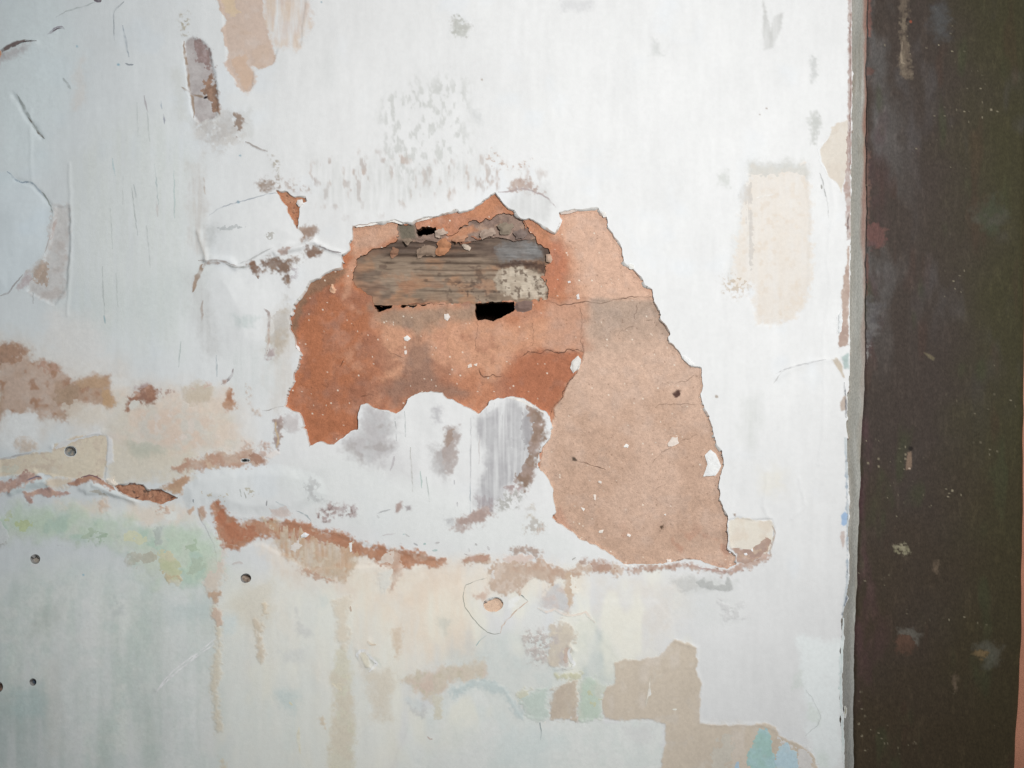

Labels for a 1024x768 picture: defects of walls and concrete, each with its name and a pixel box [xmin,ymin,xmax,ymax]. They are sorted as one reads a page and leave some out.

flaking render [215,0,317,98]
flaking render [0,194,776,623]
leakage [315,590,526,768]